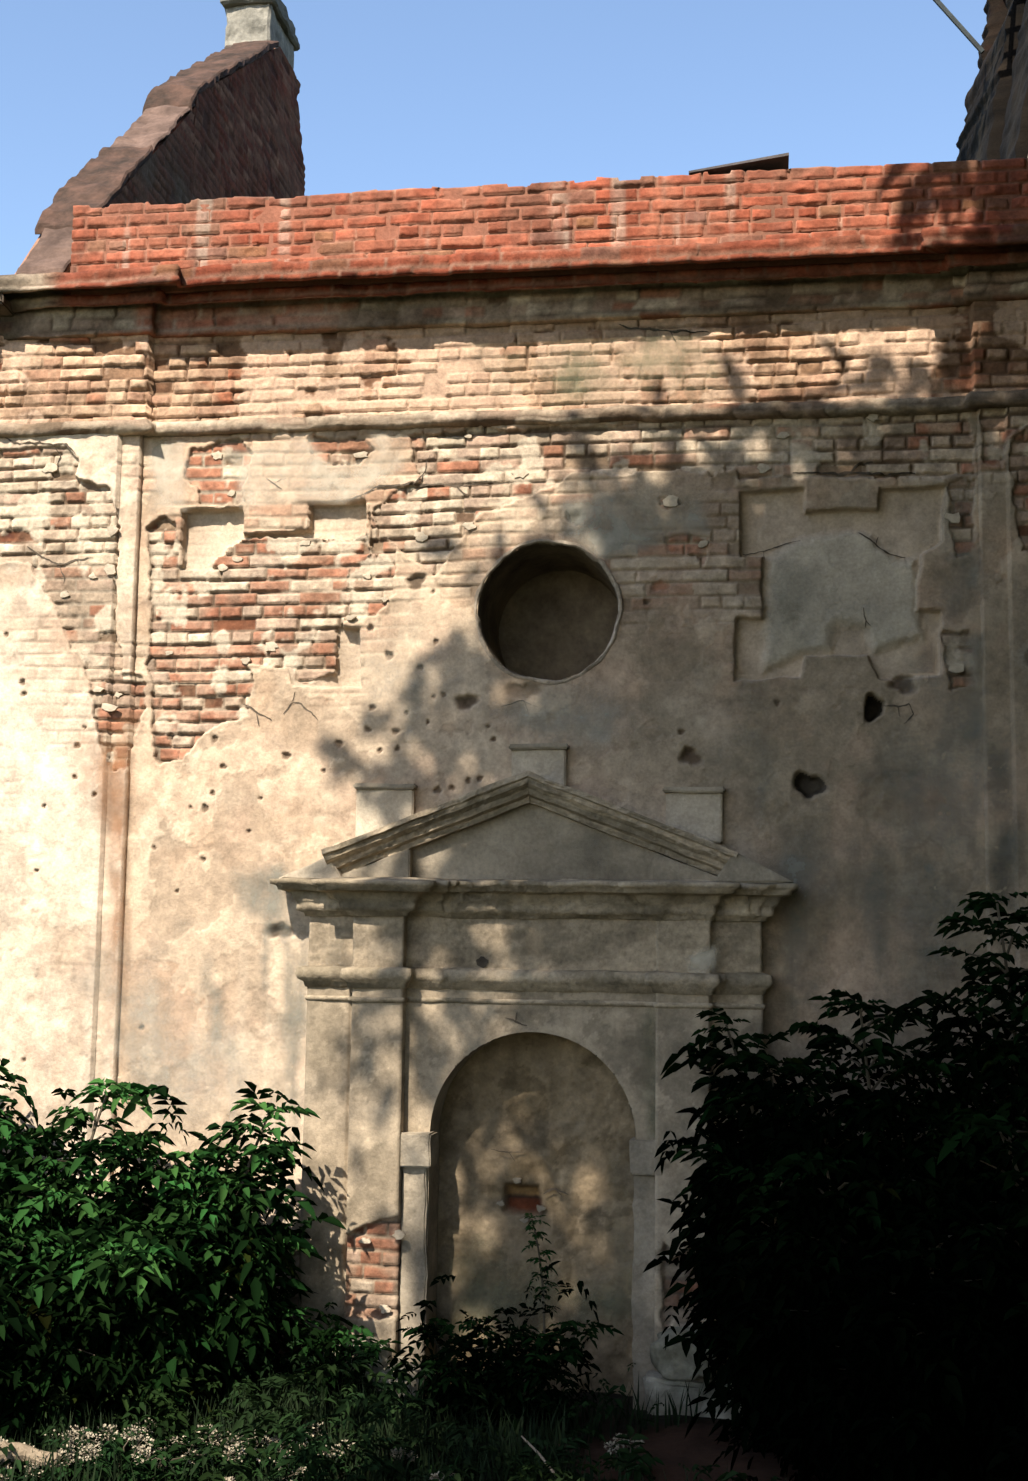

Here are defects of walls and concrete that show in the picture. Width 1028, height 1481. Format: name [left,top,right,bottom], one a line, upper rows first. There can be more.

flaking render [0,406,1028,771]
spalling [795,773,826,798]
flaking render [496,1178,546,1223]
flaking render [344,1214,406,1320]